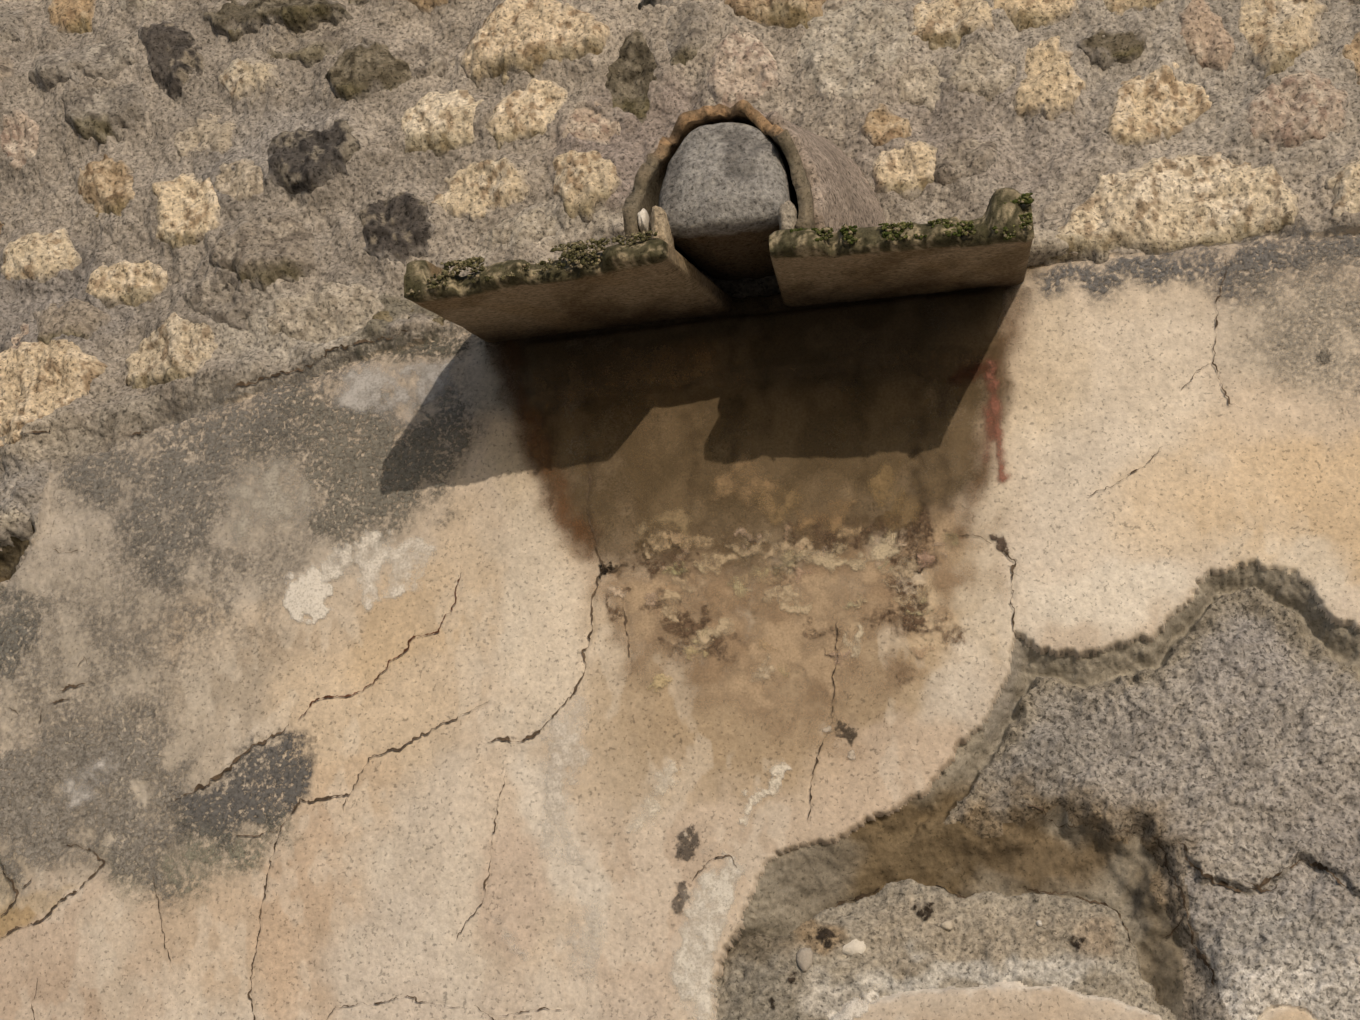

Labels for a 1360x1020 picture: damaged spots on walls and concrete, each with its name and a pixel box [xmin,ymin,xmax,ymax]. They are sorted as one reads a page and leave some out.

rust [953,360,1008,482]
crack [9,658,92,721]
crack [1,844,106,938]
crack [153,877,171,966]
crack [175,569,462,800]
crack [234,702,488,1020]
crack [327,995,560,1020]
damp [0,286,1012,899]
crack [456,454,630,940]
crack [808,622,838,817]
spalling [714,563,1360,1020]